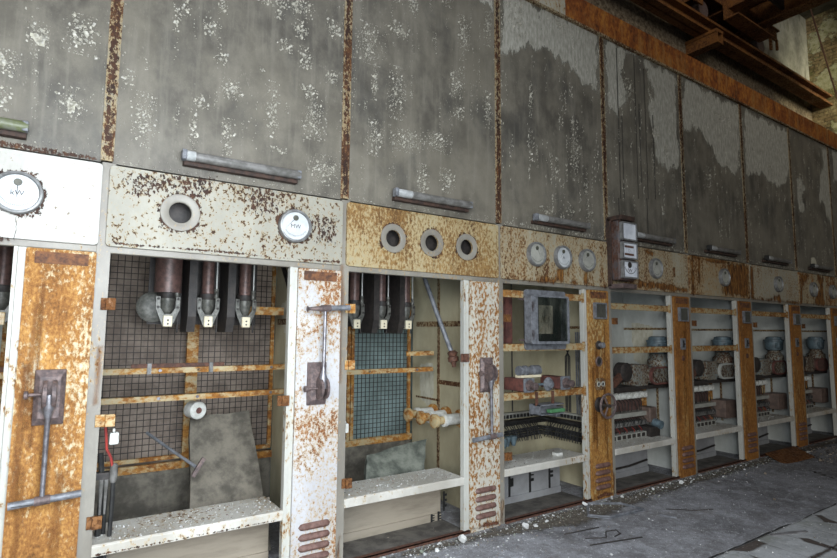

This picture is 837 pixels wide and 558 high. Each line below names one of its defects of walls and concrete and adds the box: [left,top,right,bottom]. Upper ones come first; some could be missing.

peeling [0,48,28,112]
corrosion [0,168,47,218]
corrosion [0,0,122,161]
peeling [25,12,101,60]
corrosion [341,0,353,195]
corrosion [600,38,608,237]
damp [500,0,789,234]
damp [797,176,805,213]
damp [818,145,837,224]
corrosion [12,285,44,558]